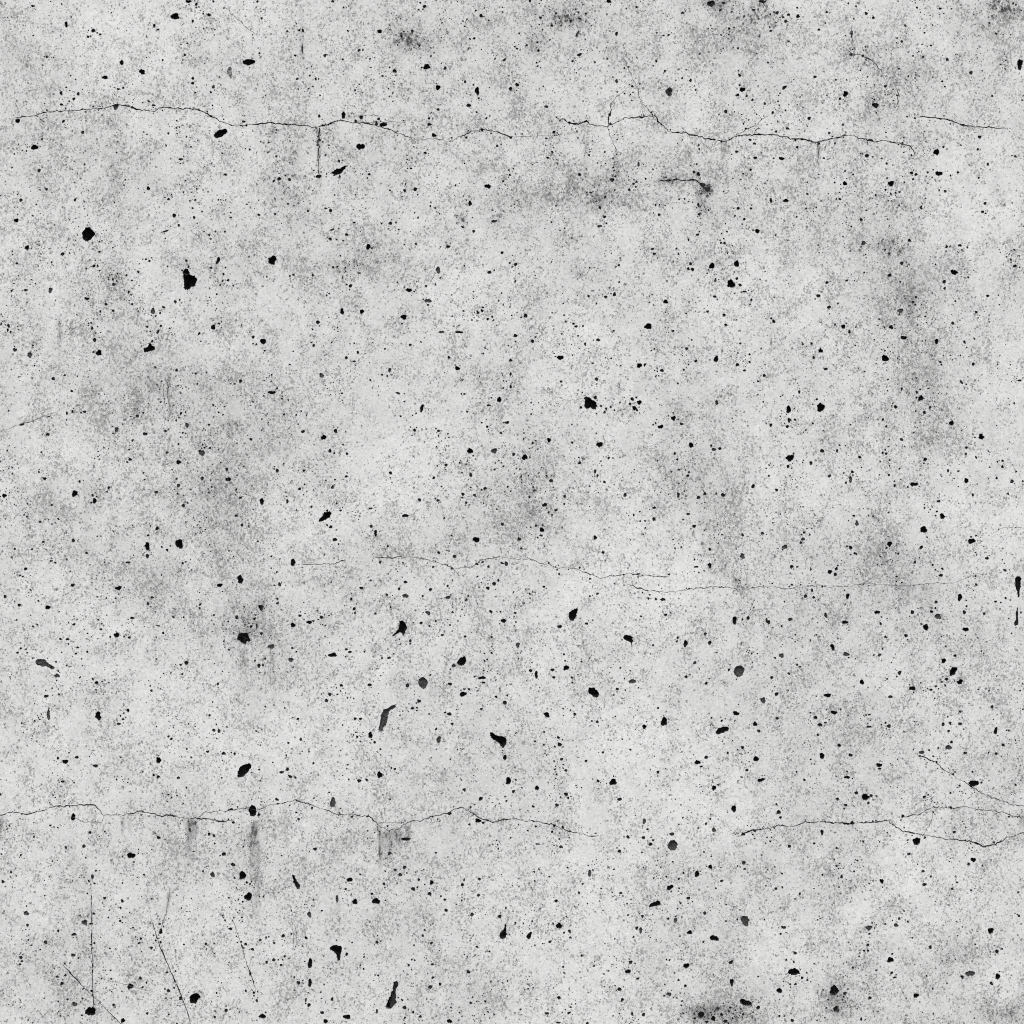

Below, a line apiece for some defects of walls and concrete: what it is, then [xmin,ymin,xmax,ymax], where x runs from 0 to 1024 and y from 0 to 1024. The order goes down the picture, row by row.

crack [16,61,915,177]
crack [921,116,1006,129]
crack [0,799,596,837]
crack [741,756,1024,847]